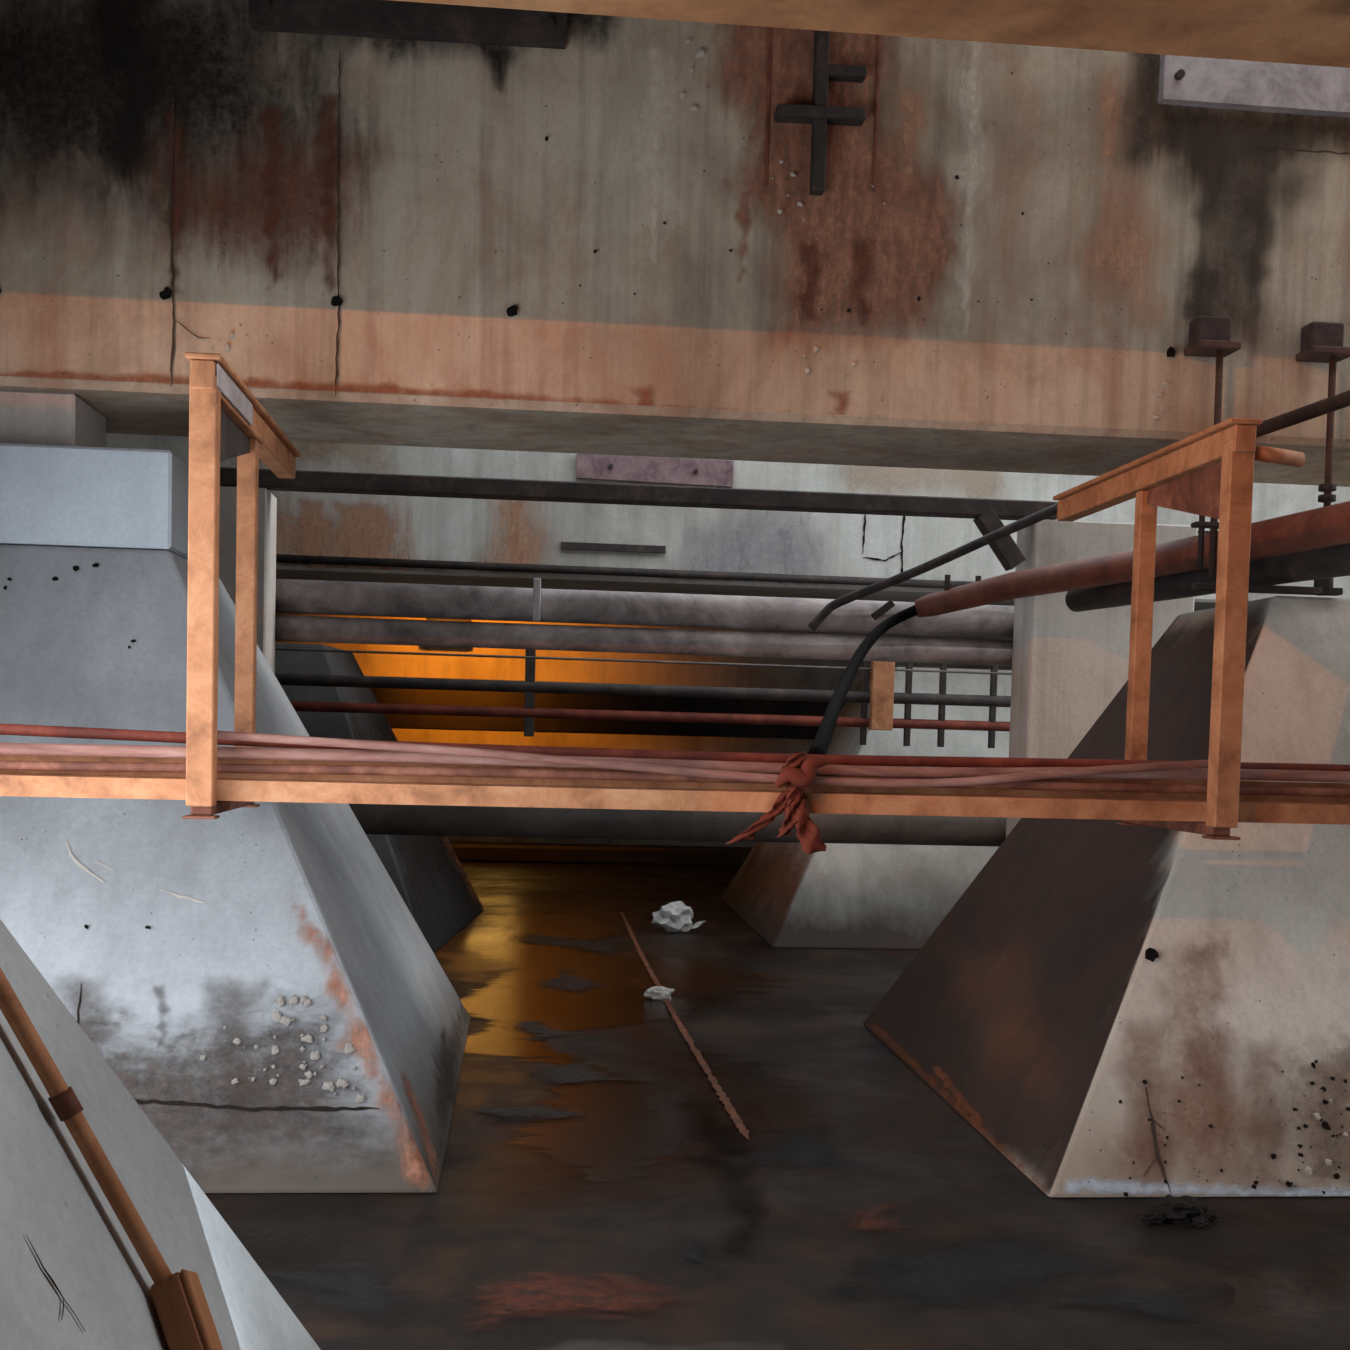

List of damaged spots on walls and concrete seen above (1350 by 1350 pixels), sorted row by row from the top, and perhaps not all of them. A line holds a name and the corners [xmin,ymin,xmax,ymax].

rust [721,25,958,337]
leakage [1121,53,1350,327]
leakage [1067,680,1128,760]
leakage [1147,617,1215,761]
leakage [1245,604,1263,671]
crack [75,983,83,1024]
leakage [105,1022,354,1158]
crack [135,1099,379,1112]
spalling [192,995,366,1102]
leakage [863,818,1350,1196]
spalling [1279,1060,1350,1194]